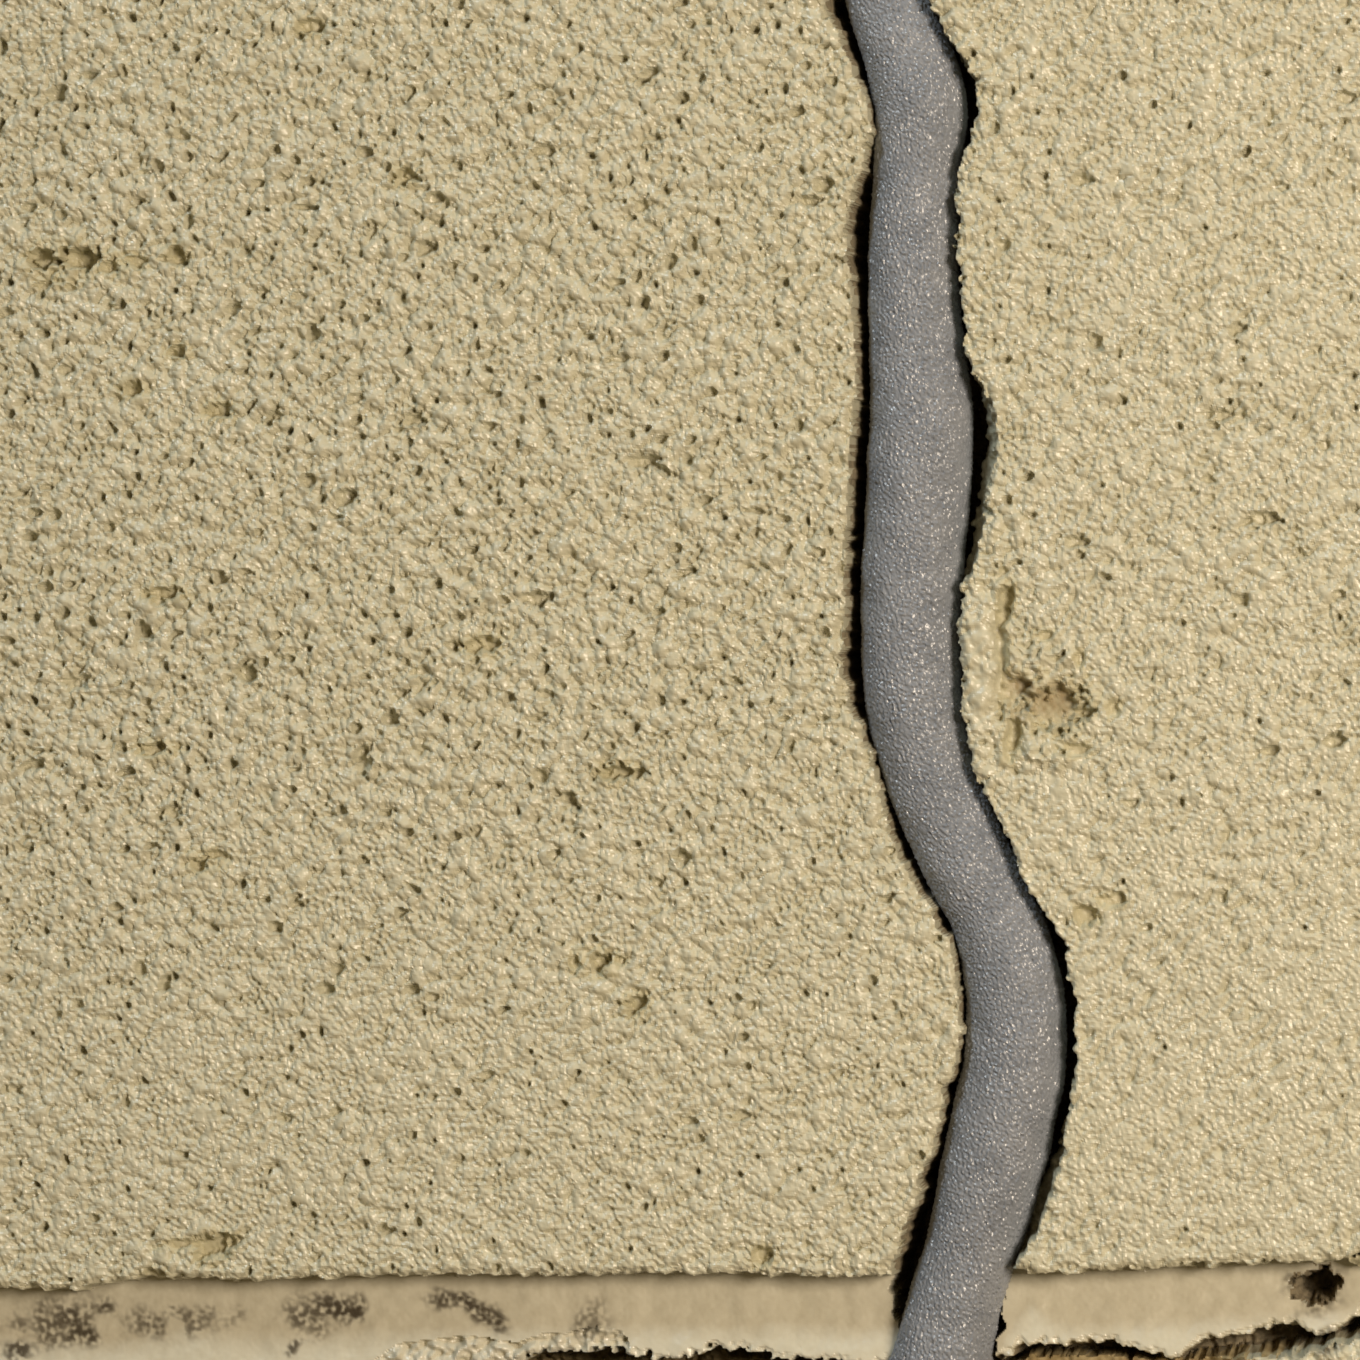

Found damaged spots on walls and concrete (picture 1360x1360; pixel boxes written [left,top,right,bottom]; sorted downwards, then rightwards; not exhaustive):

crack [932,10,979,155]
crack [953,216,989,576]
crack [825,0,967,1322]
crack [1034,896,1078,1185]
mould [7,1343,29,1358]
mould [38,1308,95,1341]
mould [289,1297,363,1353]
mould [435,1292,505,1331]
spalling [378,1324,635,1360]
crack [528,1345,842,1360]
spalling [1009,1337,1289,1360]
crack [993,1308,1360,1360]